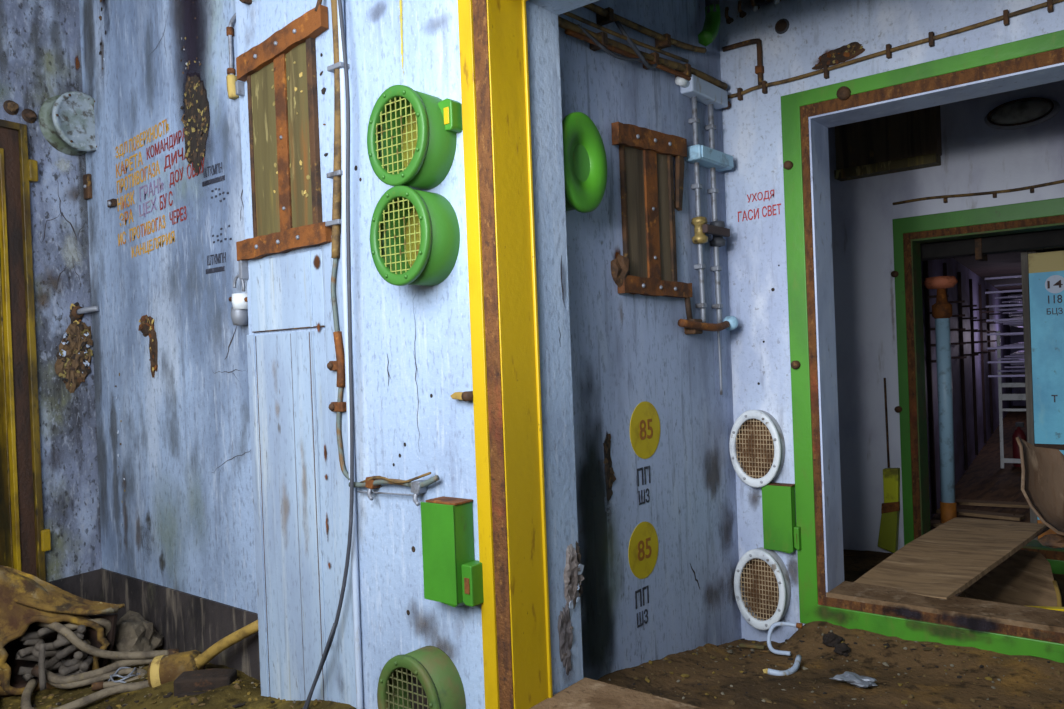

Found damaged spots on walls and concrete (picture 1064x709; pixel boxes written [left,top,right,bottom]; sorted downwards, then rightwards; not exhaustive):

leakage [84,0,107,97]
leakage [92,302,100,401]
corrosion [149,326,158,378]
leakage [97,405,150,550]
leakage [578,423,614,680]